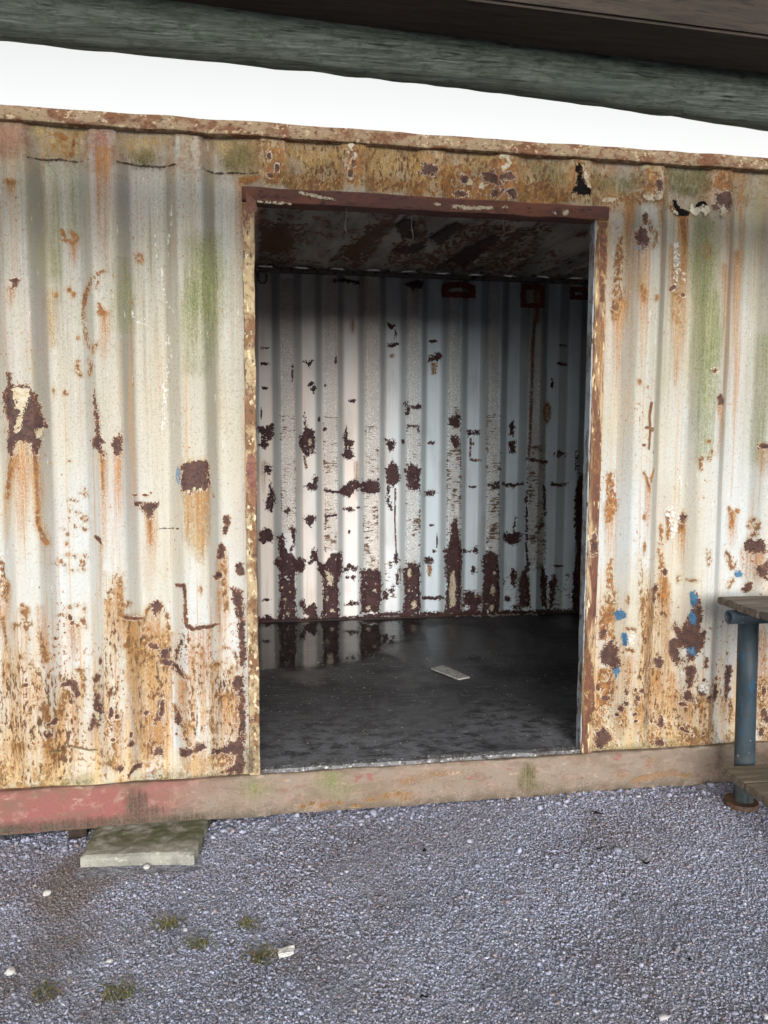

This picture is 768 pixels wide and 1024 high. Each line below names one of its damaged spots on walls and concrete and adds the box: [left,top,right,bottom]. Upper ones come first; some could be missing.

corrosion [239,140,633,369]
corrosion [645,168,664,194]
peeling [582,164,733,267]
peeling [428,339,443,375]
corrosion [246,453,257,499]
peeling [258,407,584,620]
corrosion [591,418,619,530]
corrosion [728,506,740,530]
corrosion [0,560,10,602]
corrosion [0,573,174,789]
corrosion [583,525,734,782]
corrosion [757,632,768,741]